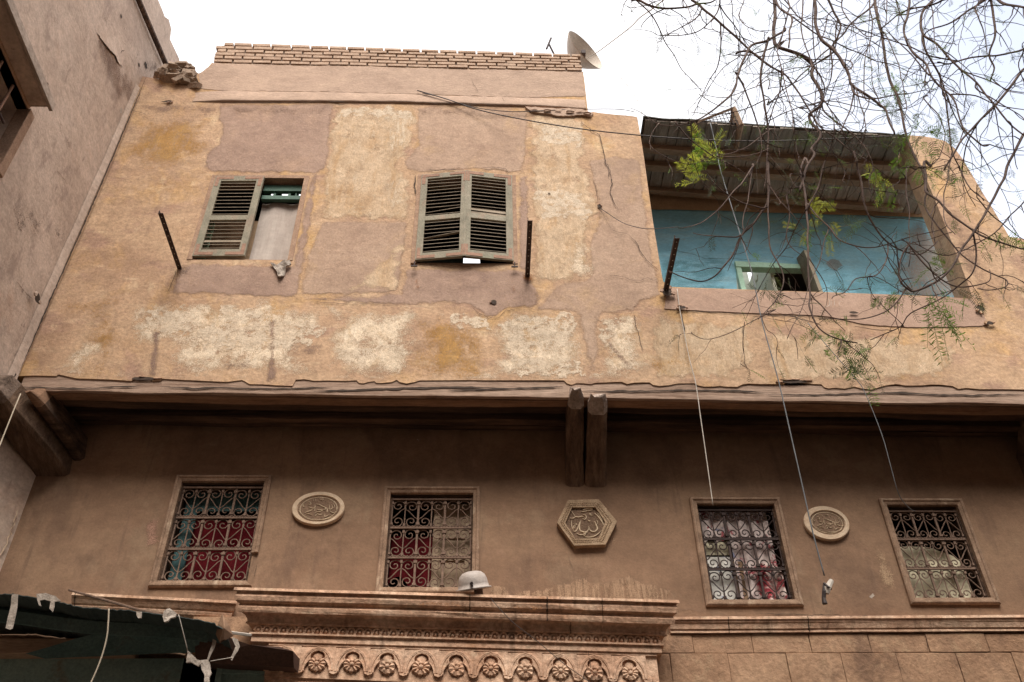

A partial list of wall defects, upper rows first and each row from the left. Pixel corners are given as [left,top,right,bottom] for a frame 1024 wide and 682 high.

crack [581,120,659,281]
damp [131,298,499,381]